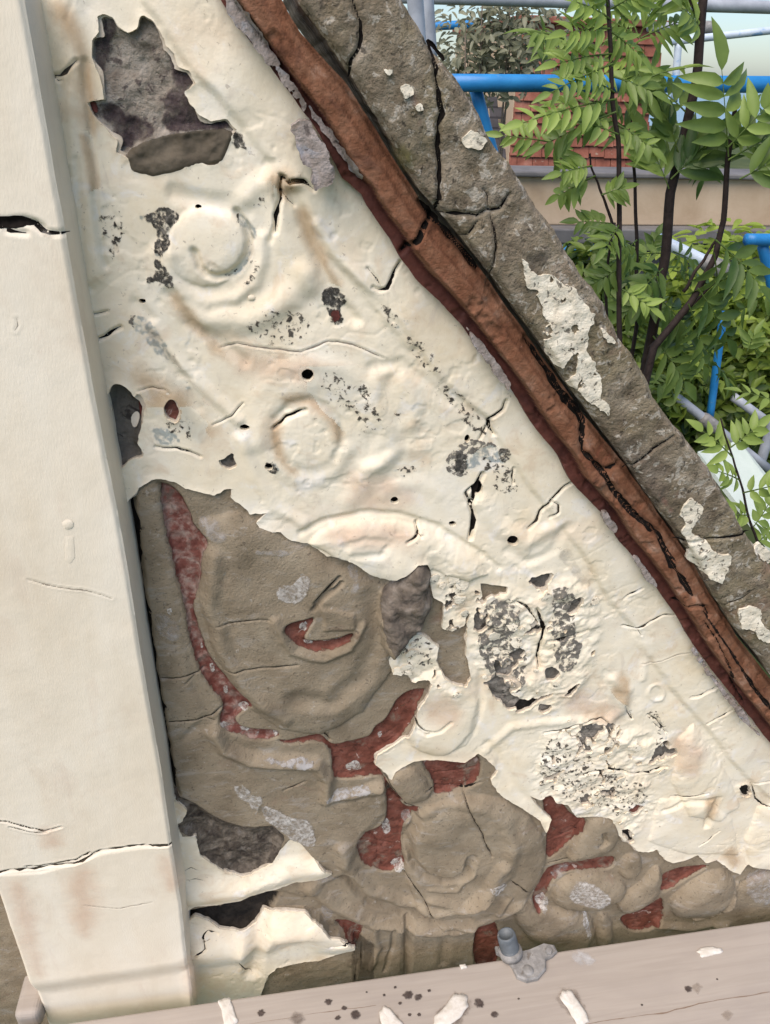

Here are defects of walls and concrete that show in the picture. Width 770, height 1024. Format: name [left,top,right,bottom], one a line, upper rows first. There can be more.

crack [347,0,363,77]
spalling [90,17,233,176]
crack [0,215,70,235]
crack [274,174,312,231]
crack [369,39,509,290]
spalling [110,384,142,465]
crack [274,409,302,427]
crack [479,401,505,438]
crack [465,473,481,536]
crack [517,338,770,719]
spalling [133,479,770,995]
crack [0,842,172,873]